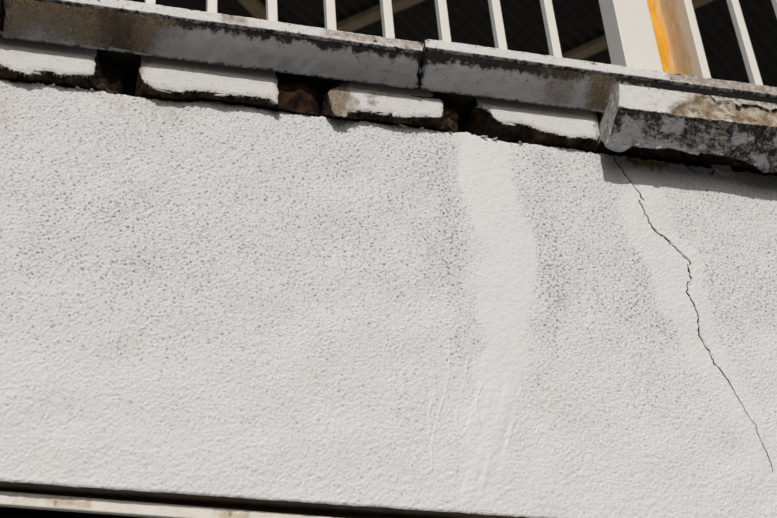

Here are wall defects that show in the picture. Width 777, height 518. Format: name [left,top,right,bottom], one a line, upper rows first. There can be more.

damp [0,0,177,54]
spalling [0,53,124,95]
spalling [133,55,279,112]
spalling [321,82,777,170]
crack [613,156,773,471]